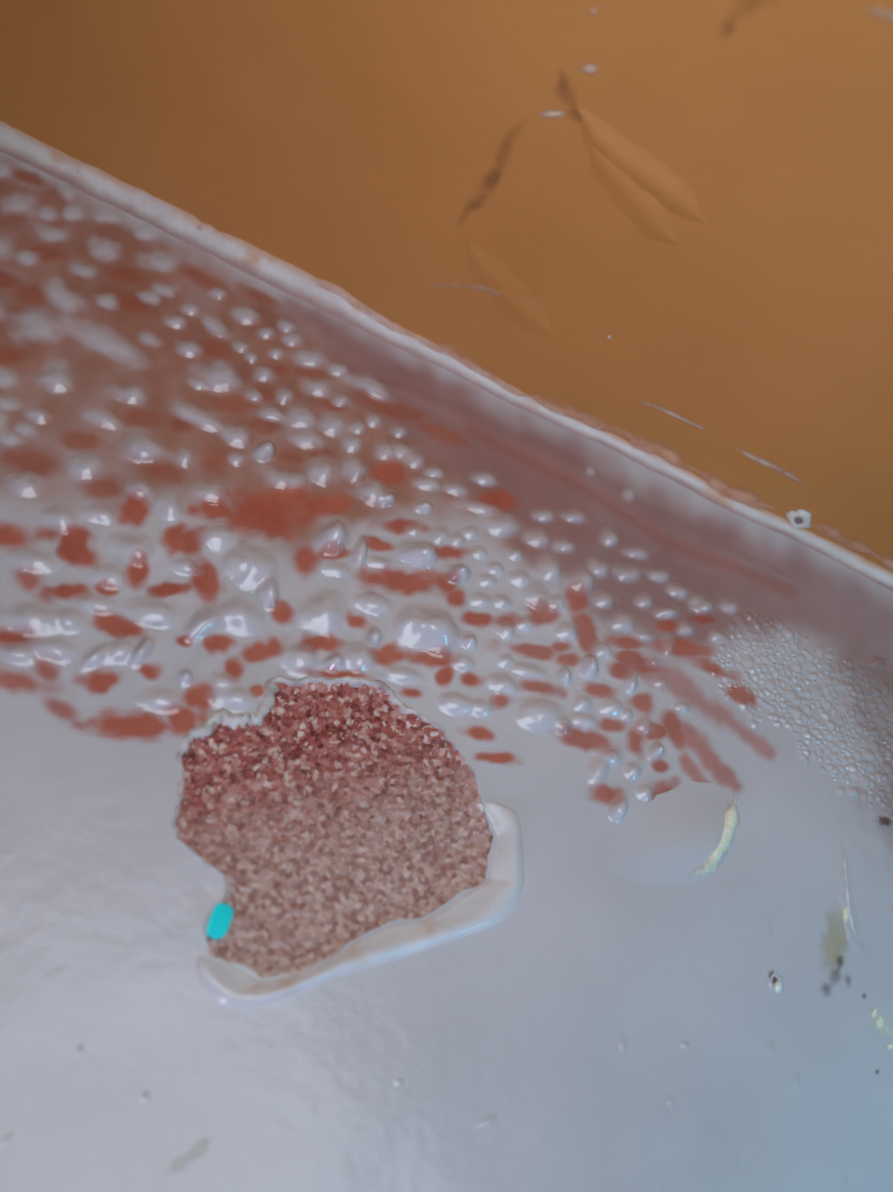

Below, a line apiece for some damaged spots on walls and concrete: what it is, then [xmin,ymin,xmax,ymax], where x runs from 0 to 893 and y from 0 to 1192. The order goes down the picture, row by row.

corrosion [0,152,796,821]
flaking render [171,675,525,1008]